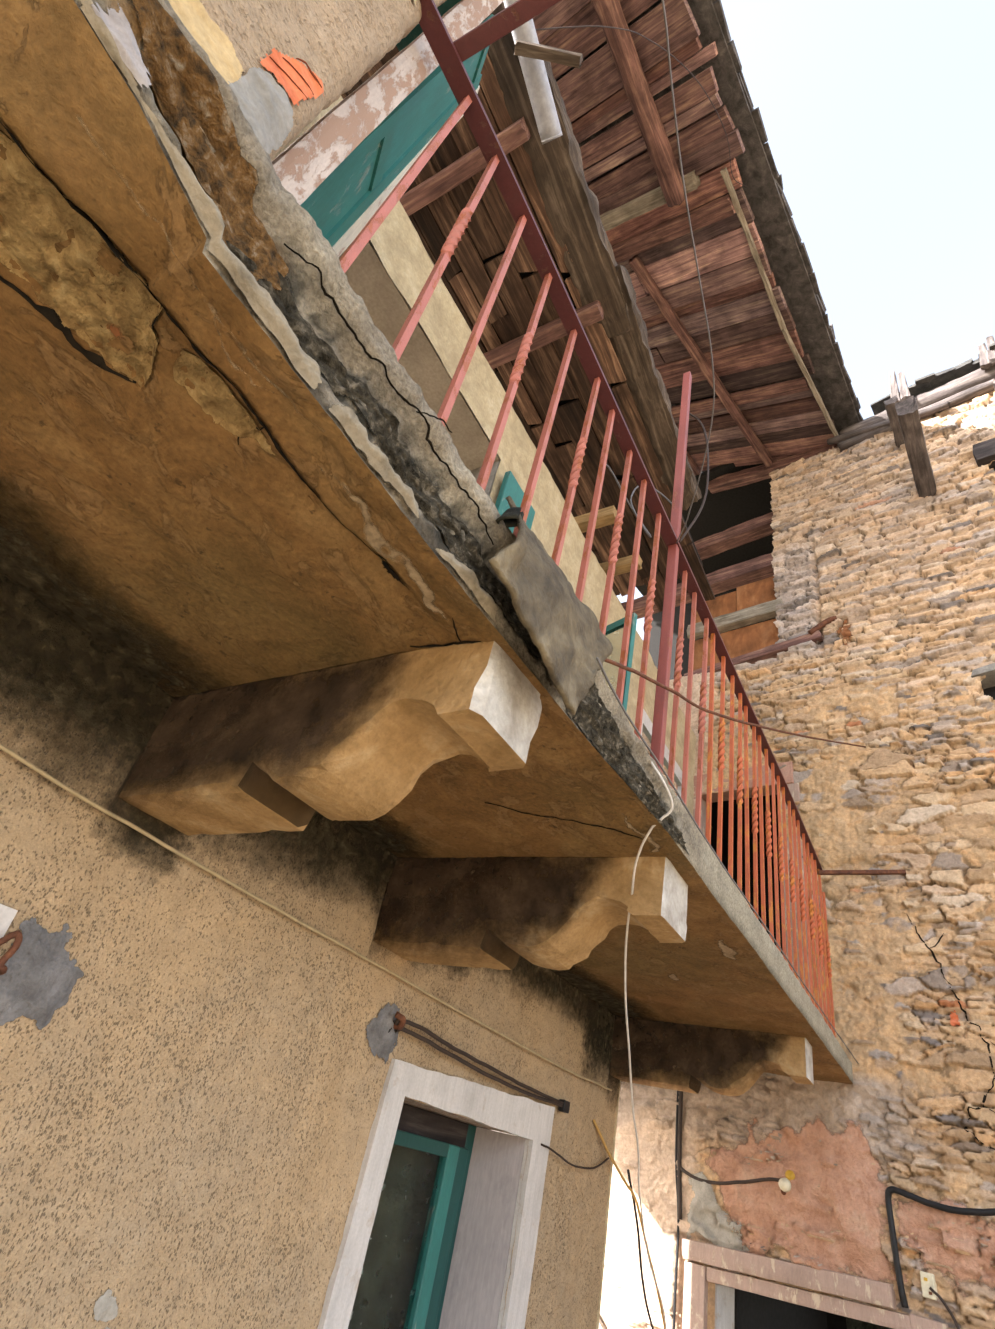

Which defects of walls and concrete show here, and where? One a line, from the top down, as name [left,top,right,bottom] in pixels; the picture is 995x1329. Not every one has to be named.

spalling [0,131,164,387]
crack [0,121,386,560]
spalling [80,0,552,686]
crack [284,243,494,545]
water stain [0,481,399,870]
water stain [344,484,446,619]
water stain [200,811,786,1095]
crack [902,912,995,1150]
peeling [705,1116,995,1297]